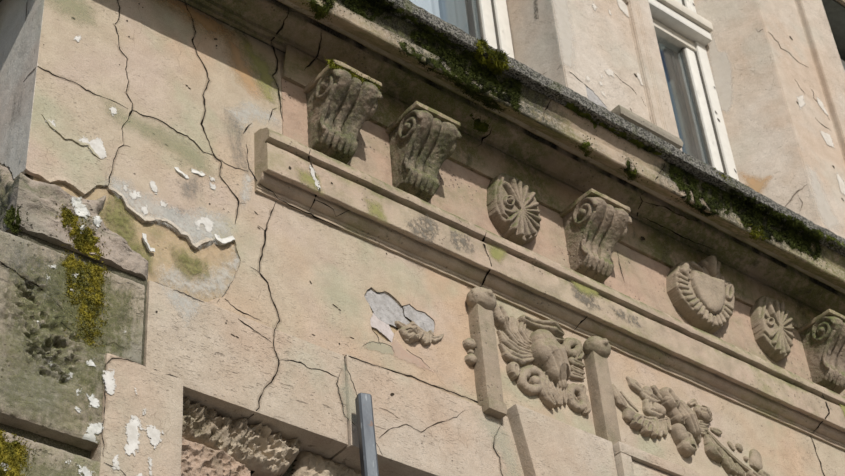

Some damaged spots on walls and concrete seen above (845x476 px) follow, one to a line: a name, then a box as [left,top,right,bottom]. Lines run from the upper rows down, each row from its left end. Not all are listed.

flaking render [41,112,107,159]
flaking render [0,164,235,280]
crack [23,0,478,426]
flaking render [364,289,435,342]
peeling [76,388,100,408]
crack [0,261,178,473]
peeling [86,359,117,395]
peeling [65,460,94,476]
peeling [82,423,104,443]
peeling [112,408,164,476]
crack [376,408,454,454]
crack [810,394,830,476]